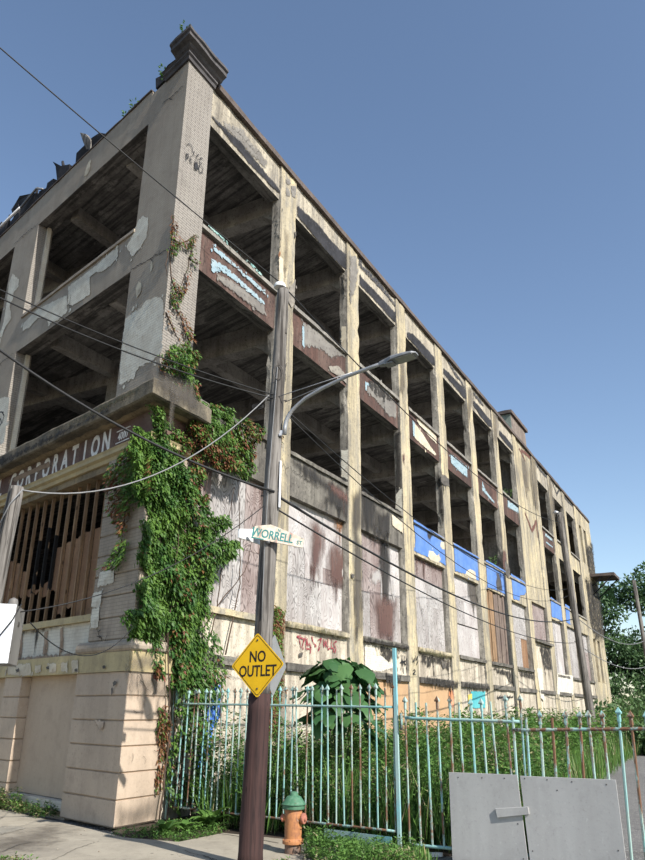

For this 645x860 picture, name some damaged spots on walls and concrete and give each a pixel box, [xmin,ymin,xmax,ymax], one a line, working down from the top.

damp [212,116,396,322]
peeling [0,274,19,342]
peeling [21,216,148,331]
peeling [119,281,167,389]
peeling [208,225,268,304]
peeling [0,397,9,445]
peeling [392,487,403,533]
damp [294,460,409,684]
peeling [414,520,526,600]